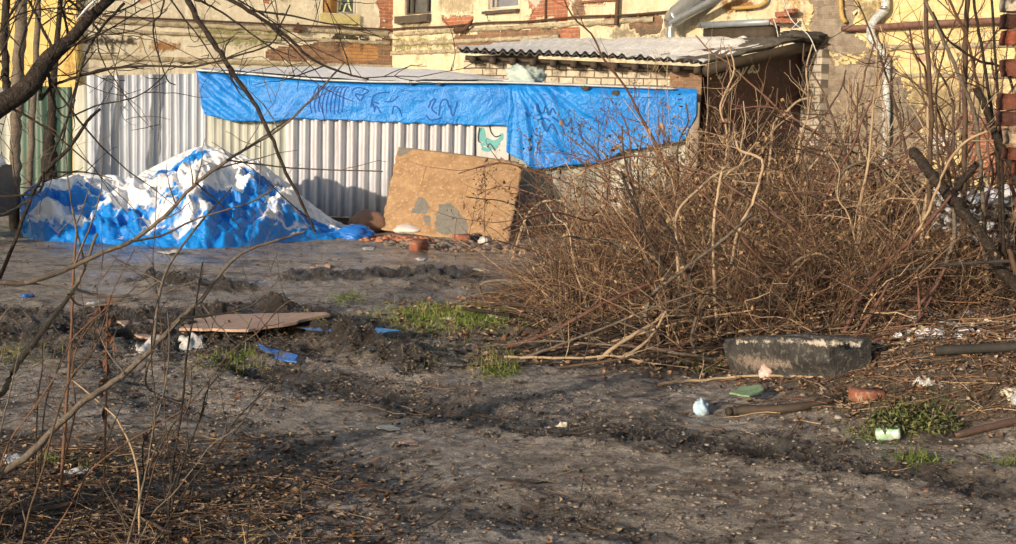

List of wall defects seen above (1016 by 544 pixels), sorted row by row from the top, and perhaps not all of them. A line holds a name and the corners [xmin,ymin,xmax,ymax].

flaking render [264,0,394,67]
flaking render [439,0,665,49]
flaking render [954,102,1012,186]